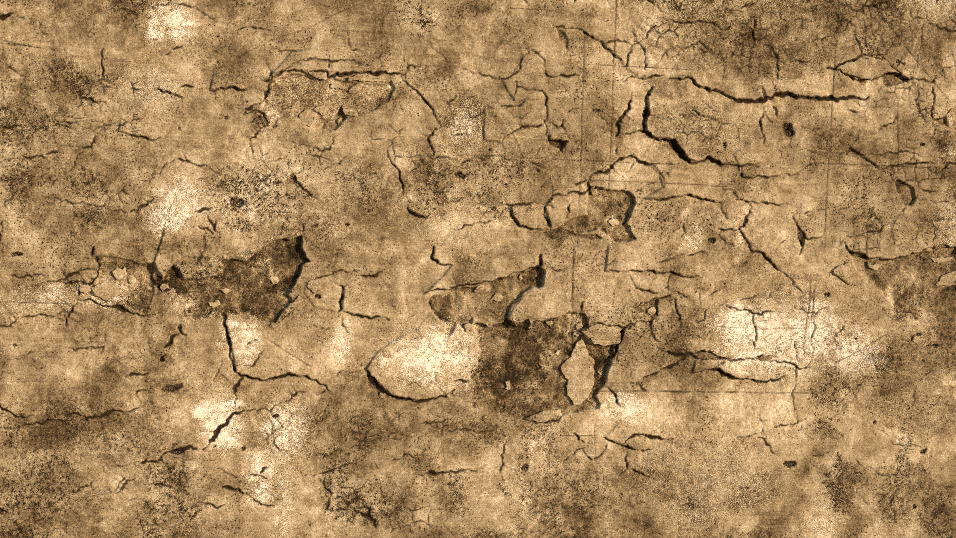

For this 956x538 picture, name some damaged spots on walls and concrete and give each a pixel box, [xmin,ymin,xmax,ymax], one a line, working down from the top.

crack [157,27,483,163]
spalling [79,235,321,323]
crack [387,151,428,218]
crack [424,246,561,294]
crack [461,0,956,454]
spalling [850,246,956,322]
crack [0,334,186,428]
crack [118,312,505,491]
spalling [367,377,386,399]
spalling [429,267,624,422]
crack [205,440,287,509]
crack [533,418,664,476]